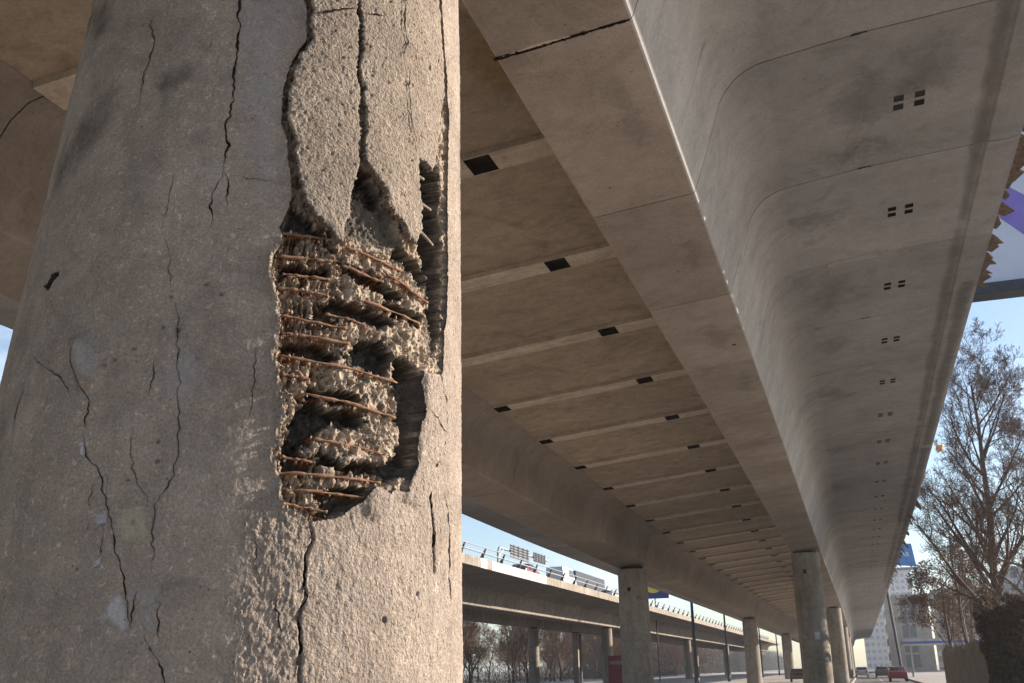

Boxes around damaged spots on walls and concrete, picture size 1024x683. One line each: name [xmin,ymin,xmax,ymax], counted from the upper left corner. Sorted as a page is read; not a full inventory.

crack [198,0,270,245]
crack [311,0,421,154]
crack [130,174,181,561]
spalling [268,0,450,527]
crack [12,339,165,683]
crack [274,526,328,681]
crack [429,395,452,605]